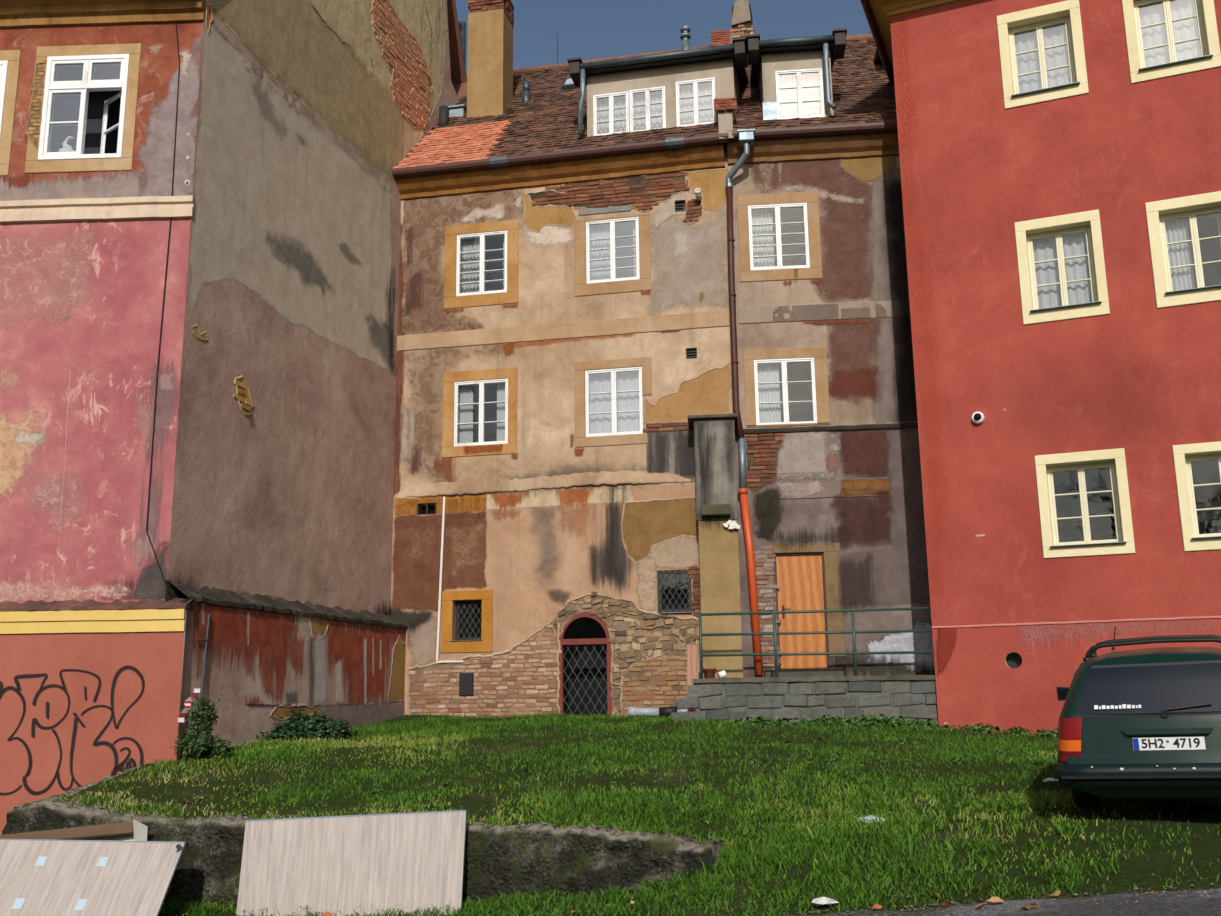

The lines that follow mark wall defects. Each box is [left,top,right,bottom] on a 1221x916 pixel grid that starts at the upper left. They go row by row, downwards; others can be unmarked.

flaking render [371,0,433,129]
flaking render [461,168,730,255]
damp [268,236,327,292]
damp [339,244,359,263]
spalling [643,362,732,433]
peeling [0,409,82,530]
damp [486,470,631,586]
peeling [0,579,131,602]
flaking render [359,490,701,718]
damp [551,592,568,602]
spalling [269,703,320,721]